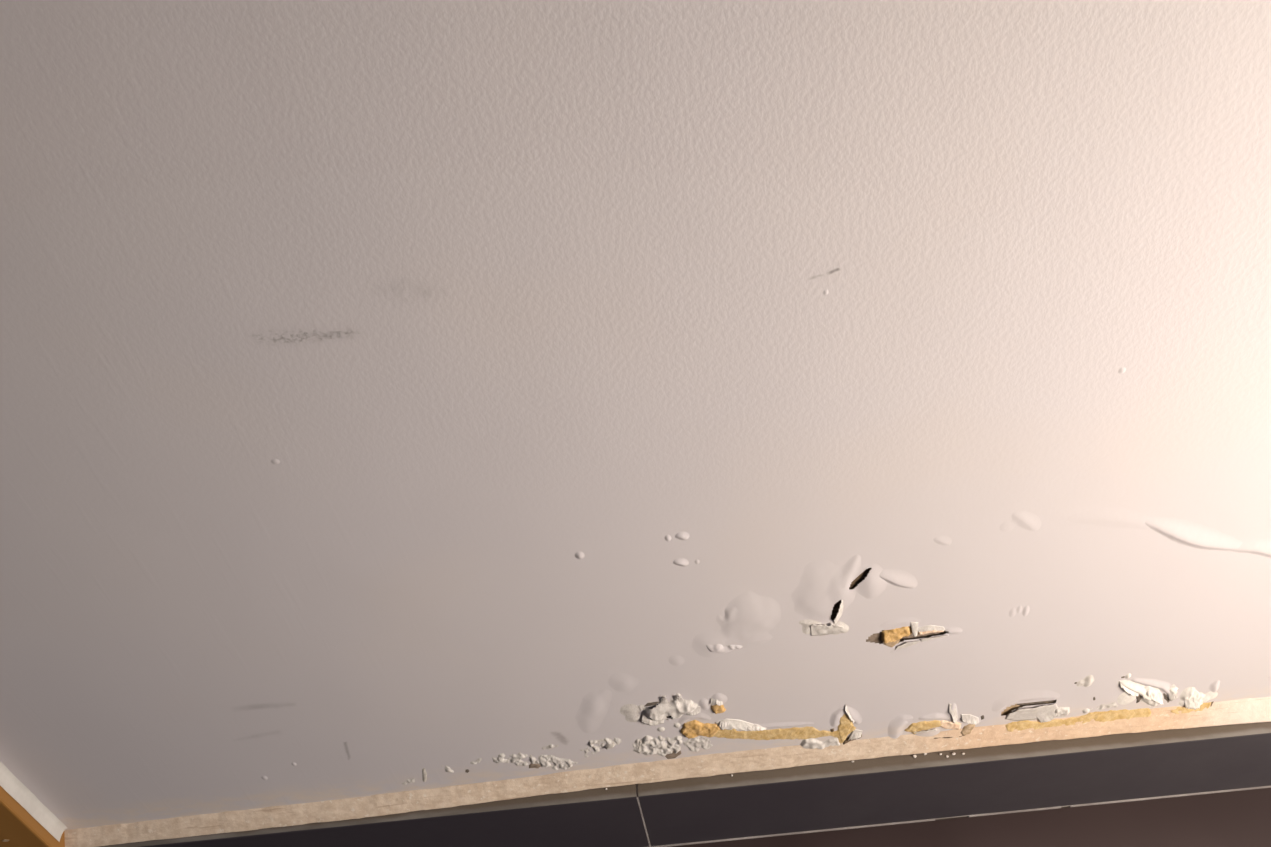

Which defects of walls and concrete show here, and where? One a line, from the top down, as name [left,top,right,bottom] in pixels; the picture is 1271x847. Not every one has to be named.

spalling [866,617,963,654]
flaking render [64,673,1271,847]